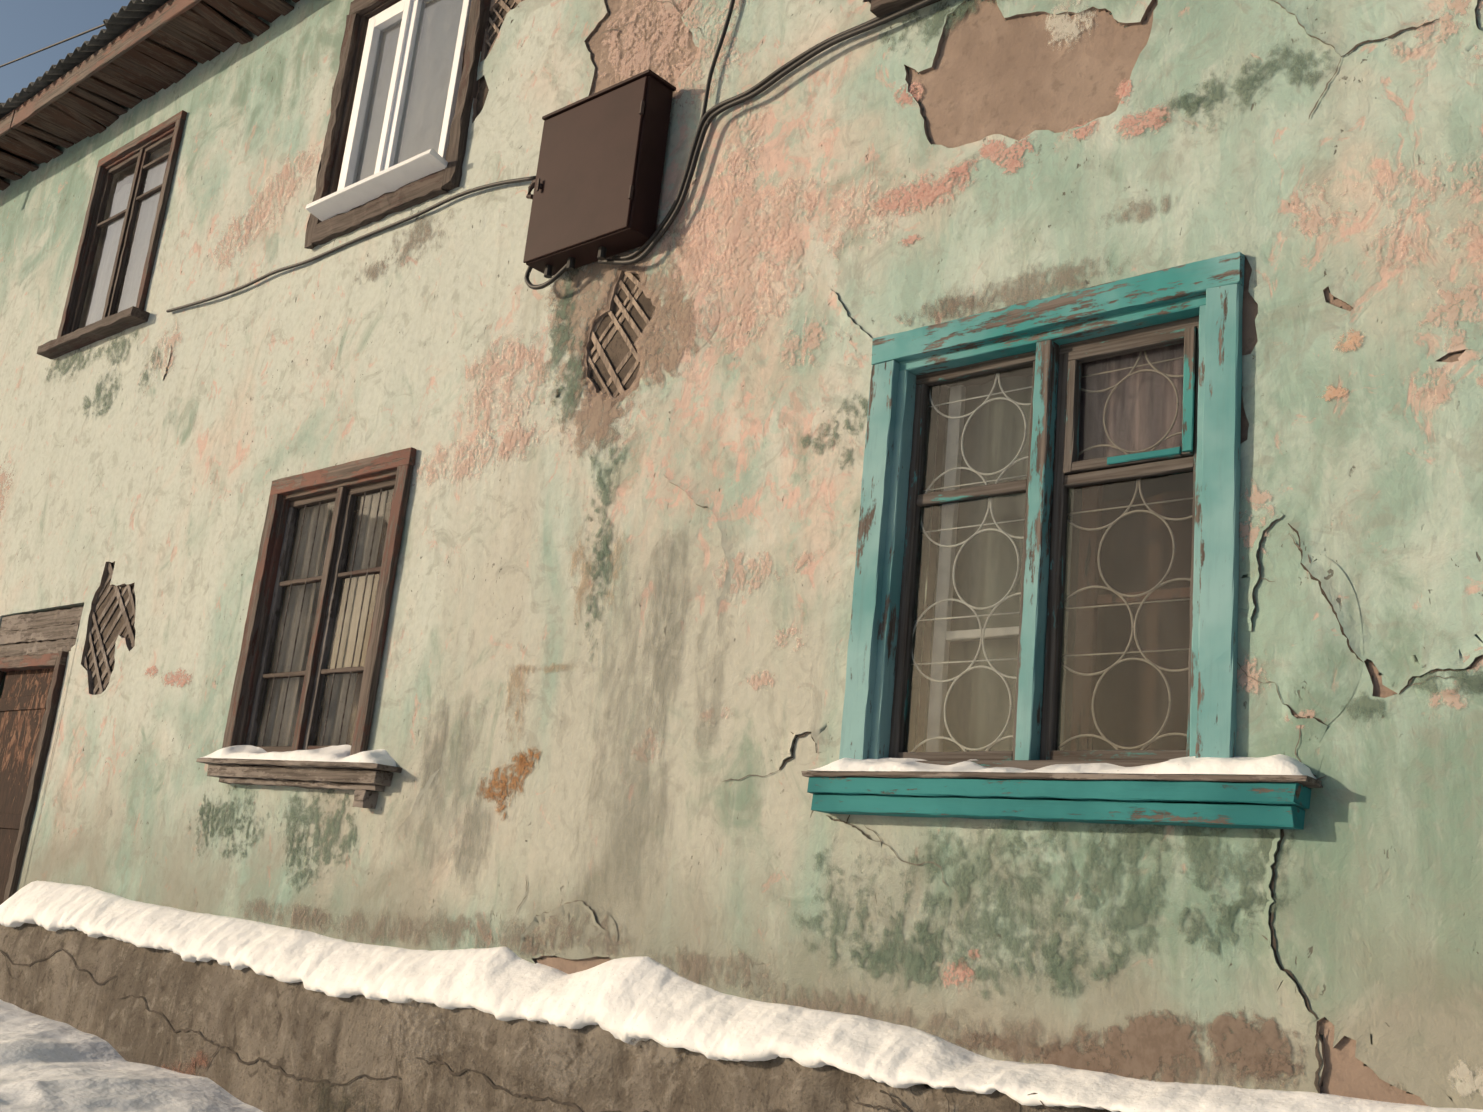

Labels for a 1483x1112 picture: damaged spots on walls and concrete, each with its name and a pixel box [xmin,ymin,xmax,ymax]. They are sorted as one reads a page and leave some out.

flaking render [575,0,754,115]
flaking render [873,0,1174,216]
crack [1271,0,1483,118]
flaking render [581,264,661,407]
flaking render [1415,283,1483,403]
flaking render [73,548,192,710]
crack [1237,502,1483,780]
water stain [196,786,356,924]
crack [1,948,649,1112]
water stain [799,822,1294,996]
flaking render [956,996,1458,1108]
crack [1248,829,1323,1093]